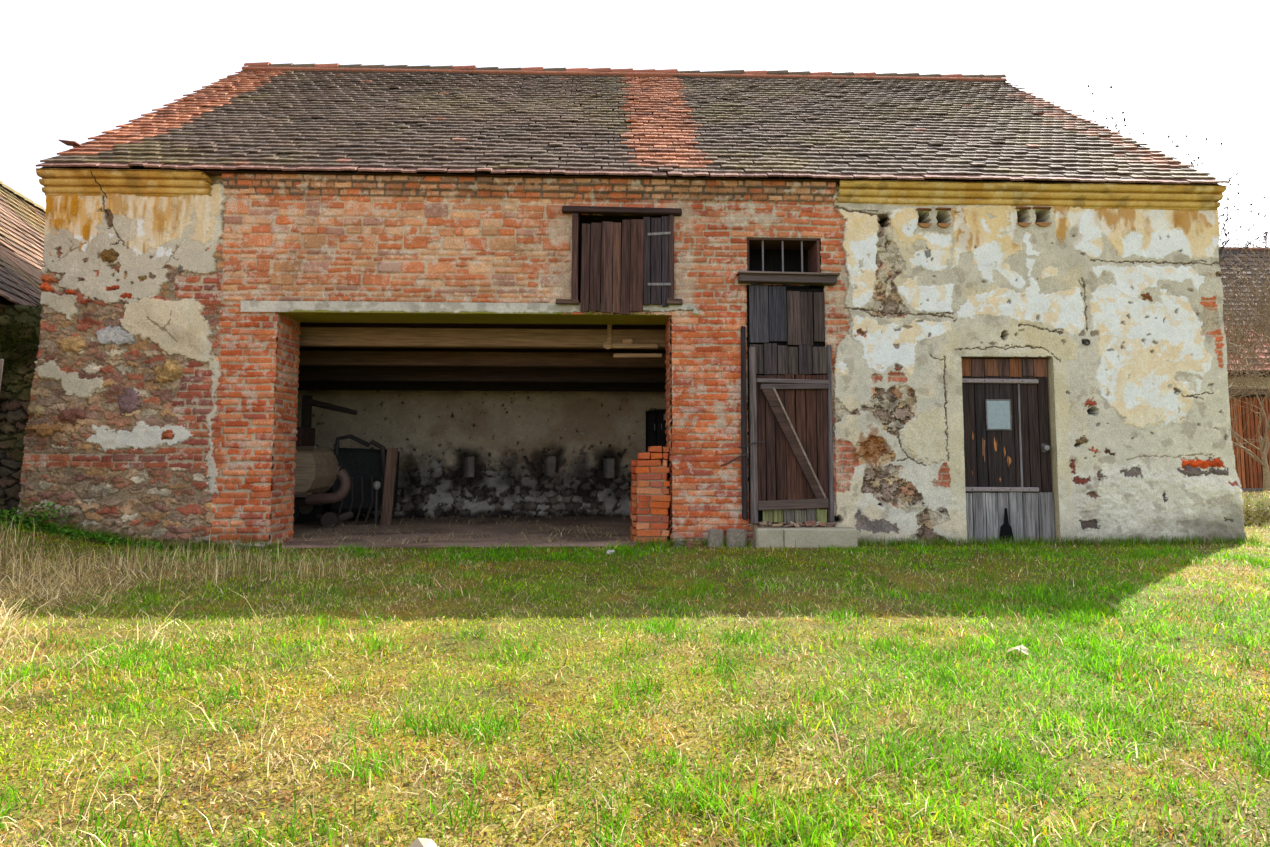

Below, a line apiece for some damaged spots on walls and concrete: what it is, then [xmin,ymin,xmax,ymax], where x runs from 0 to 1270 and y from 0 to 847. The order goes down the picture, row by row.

damp [45,195,90,250]
crack [70,171,125,252]
damp [1053,205,1070,242]
damp [1096,207,1135,230]
damp [1175,210,1209,232]
peeling [34,183,228,494]
peeling [834,205,1225,543]